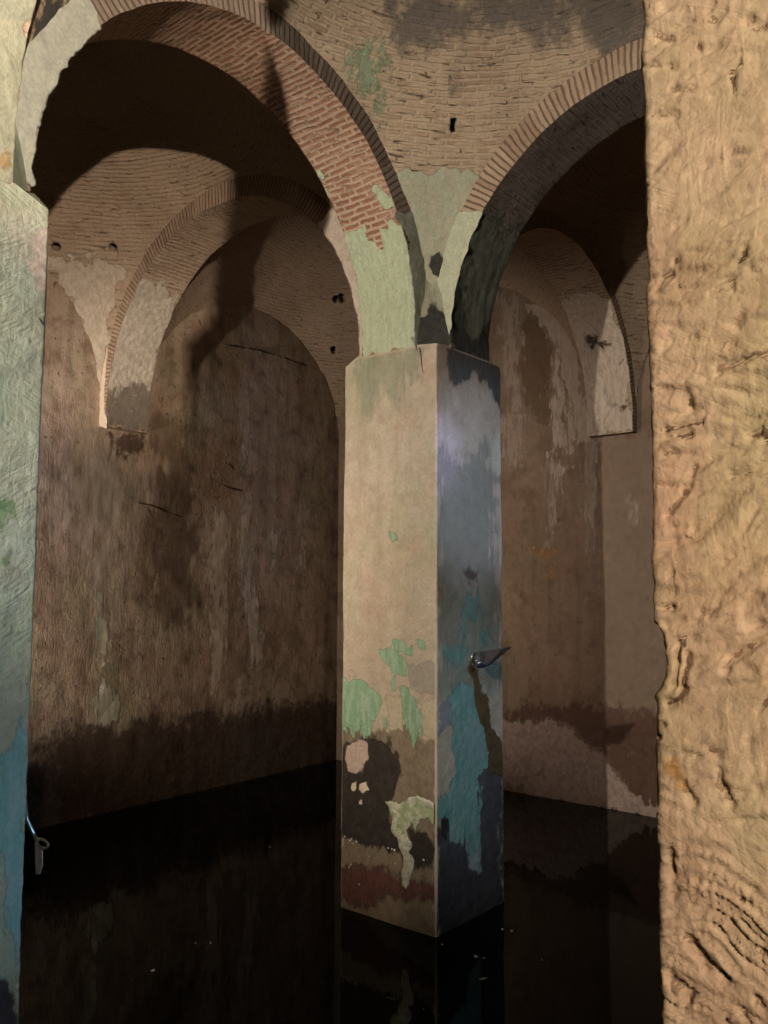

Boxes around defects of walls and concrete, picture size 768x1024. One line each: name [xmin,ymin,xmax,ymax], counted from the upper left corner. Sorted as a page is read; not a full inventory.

water stain [385,0,645,57]
peeling [316,166,482,357]
peeling [47,252,179,428]
crack [208,340,317,370]
crack [130,497,180,518]
water stain [24,383,658,937]
flaking render [345,739,369,773]